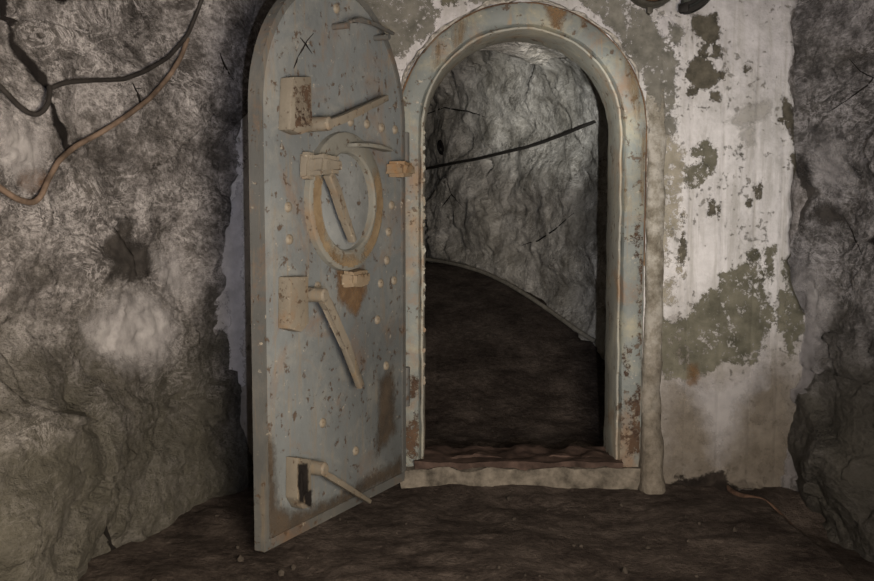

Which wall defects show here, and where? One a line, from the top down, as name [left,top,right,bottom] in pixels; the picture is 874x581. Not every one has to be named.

peeling [364,0,487,58]
crack [0,0,76,153]
crack [830,59,874,111]
peeling [579,0,746,305]
peeling [662,244,821,406]
corrosion [621,384,641,461]
peeling [783,448,798,489]